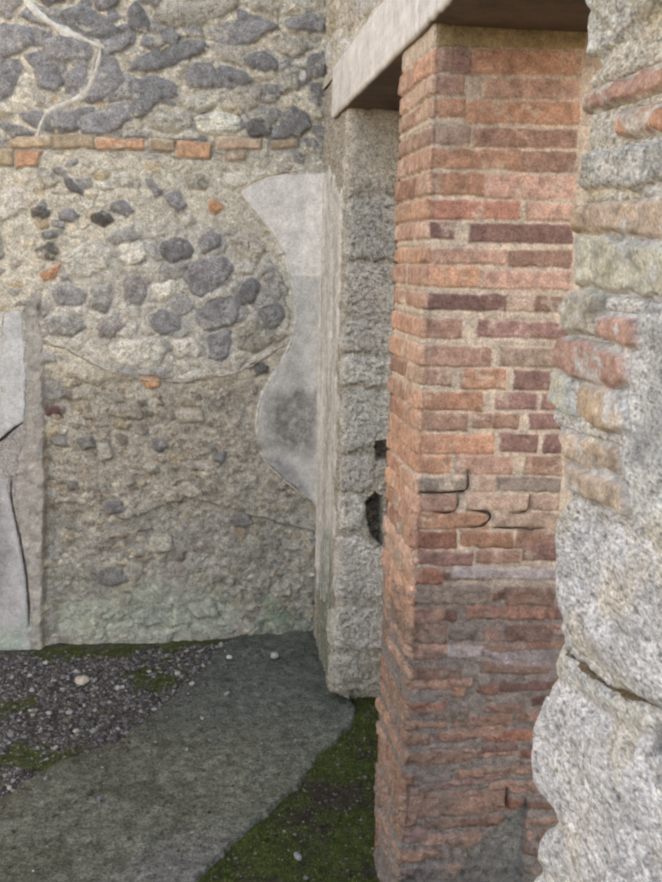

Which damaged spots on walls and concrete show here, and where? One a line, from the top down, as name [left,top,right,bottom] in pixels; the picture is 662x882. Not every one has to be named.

crack [23,0,101,136]
crack [0,423,22,442]
flaking render [0,311,27,442]
flaking render [0,478,31,650]
crack [10,479,31,627]
spalling [39,156,345,645]
spalling [365,492,379,539]
spalling [374,440,389,457]